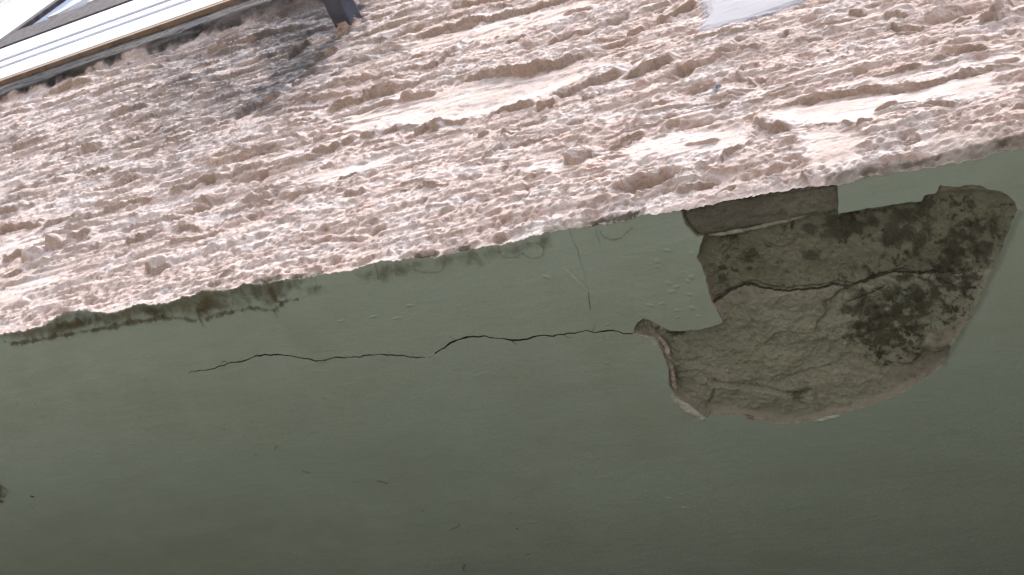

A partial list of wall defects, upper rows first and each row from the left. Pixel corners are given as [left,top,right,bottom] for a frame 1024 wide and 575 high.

crack [188,230,633,373]
spalling [634,185,1021,428]
crack [712,265,969,303]